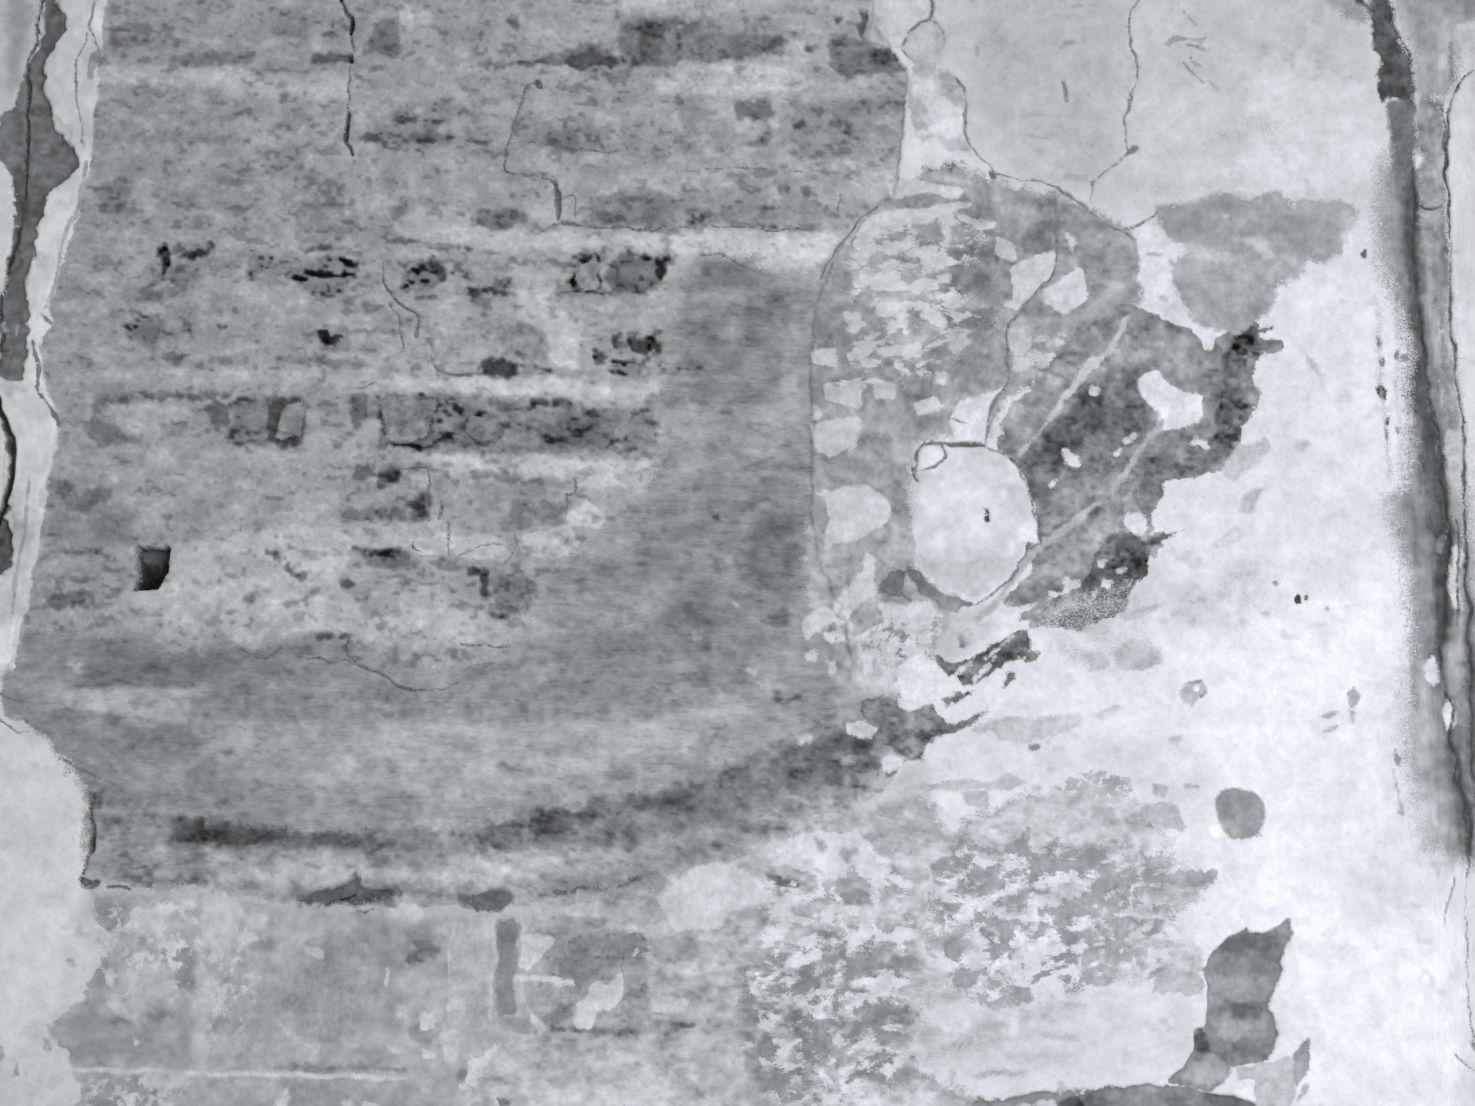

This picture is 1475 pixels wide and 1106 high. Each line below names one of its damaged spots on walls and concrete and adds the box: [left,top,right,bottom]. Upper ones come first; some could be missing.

crack [339,0,355,156]
leakage [1326,0,1373,27]
crack [0,0,44,526]
spalling [0,0,80,382]
crack [911,0,1158,606]
peeling [1135,224,1191,328]
spalling [1150,189,1360,336]
leakage [1360,0,1475,873]
leakage [1030,574,1165,675]
crack [0,693,148,891]
spalling [971,1083,1256,1106]
spalling [1168,918,1311,1106]